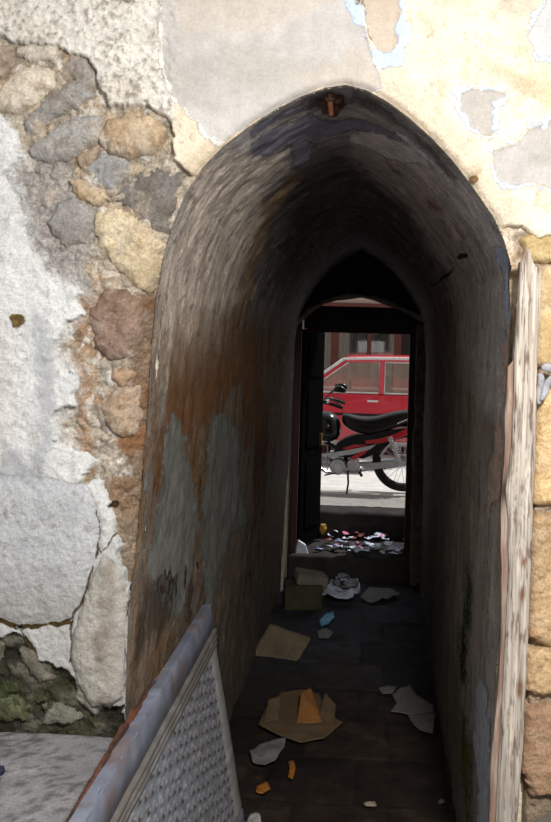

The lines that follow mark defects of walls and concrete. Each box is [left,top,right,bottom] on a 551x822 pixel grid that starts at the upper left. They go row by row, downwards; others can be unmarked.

peeling [156,0,455,189]
peeling [451,82,551,192]
peeling [526,0,551,63]
flaking render [0,38,248,617]
crack [0,510,117,663]
peeling [487,410,504,511]
flaking render [492,227,551,822]
flaking render [0,632,126,738]